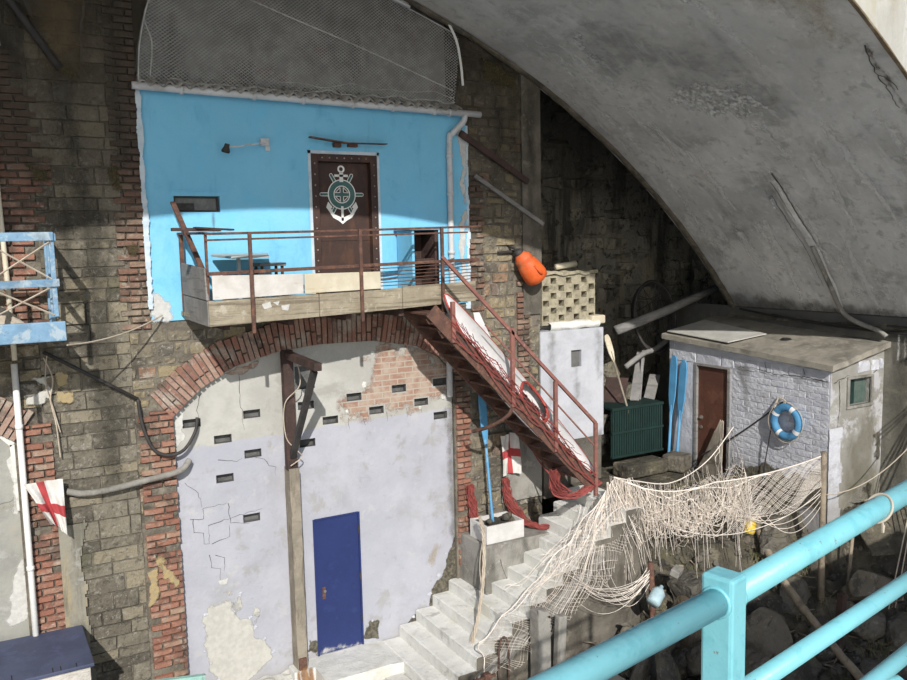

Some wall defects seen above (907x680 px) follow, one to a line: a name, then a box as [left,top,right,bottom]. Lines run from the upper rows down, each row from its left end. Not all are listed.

crack [864,45,898,106]
flaking render [135,89,173,322]
flaking render [338,342,447,421]
peeling [6,456,20,516]
crack [185,483,259,580]
peeling [6,560,28,626]
peeling [202,578,276,680]